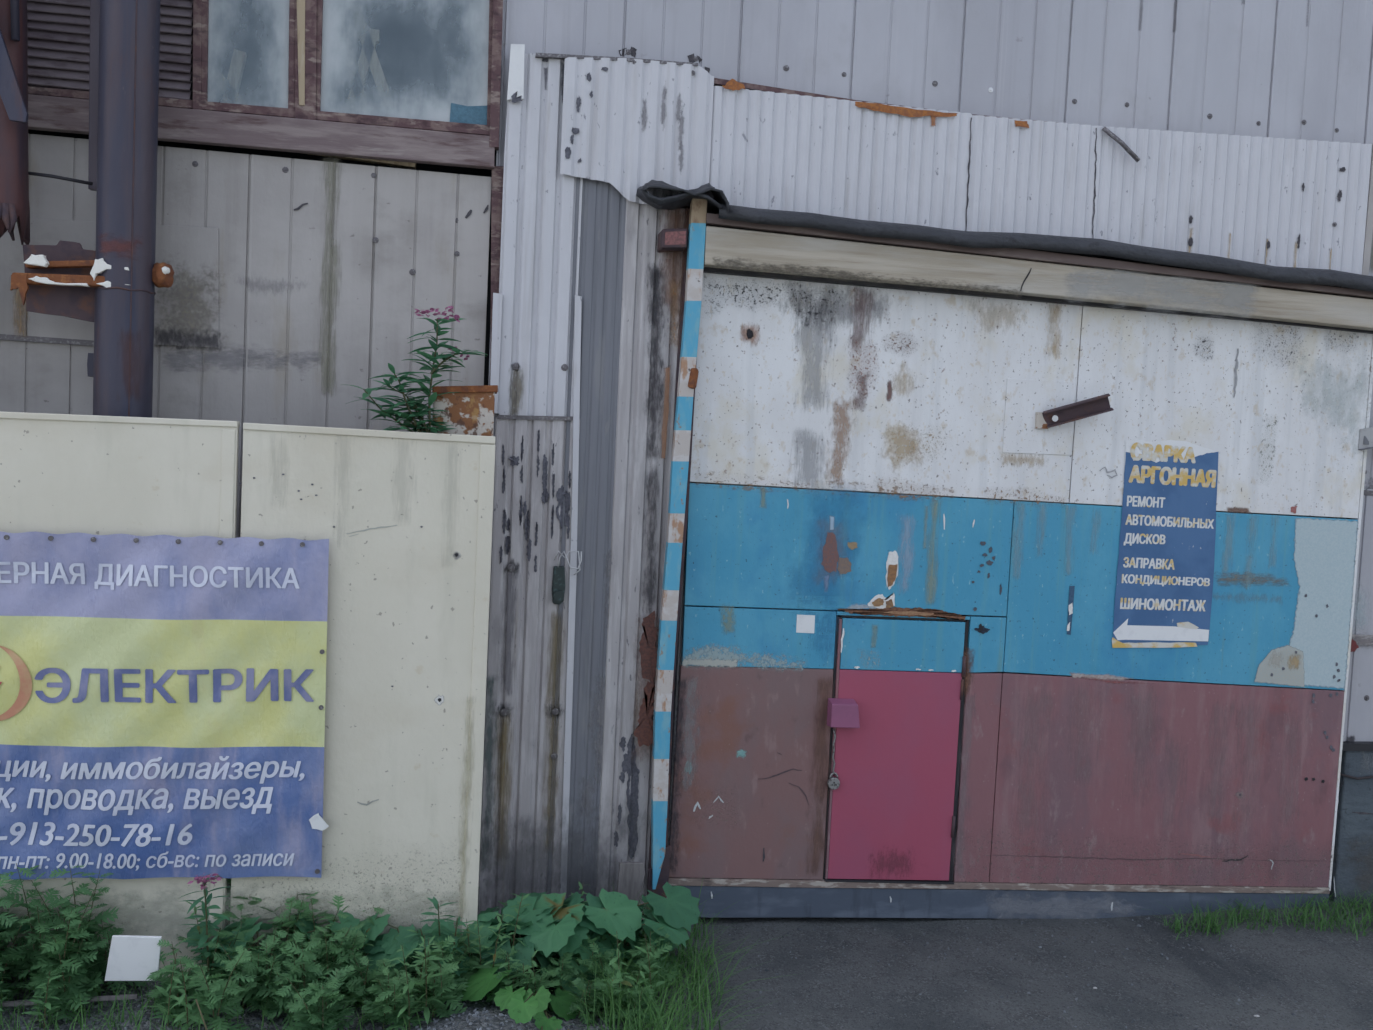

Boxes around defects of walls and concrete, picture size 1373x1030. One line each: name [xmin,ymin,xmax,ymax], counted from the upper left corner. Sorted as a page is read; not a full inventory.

corrosion [855,101,957,126]
water stain [322,161,337,391]
peeling [848,551,898,609]
peeling [1255,645,1341,704]